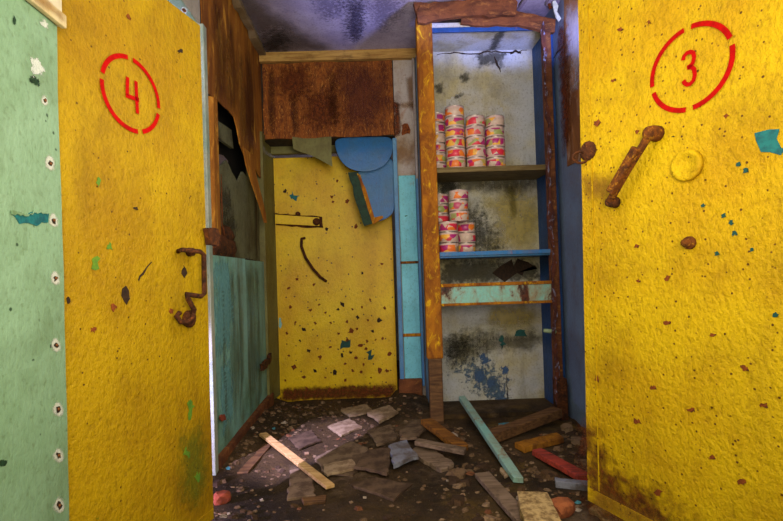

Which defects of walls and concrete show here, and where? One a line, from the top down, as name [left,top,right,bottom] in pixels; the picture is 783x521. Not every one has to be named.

water stain [339,0,365,40]
corrosion [200,0,263,178]
corrosion [393,102,411,136]
corrosion [281,298,396,401]
water stain [446,306,540,366]